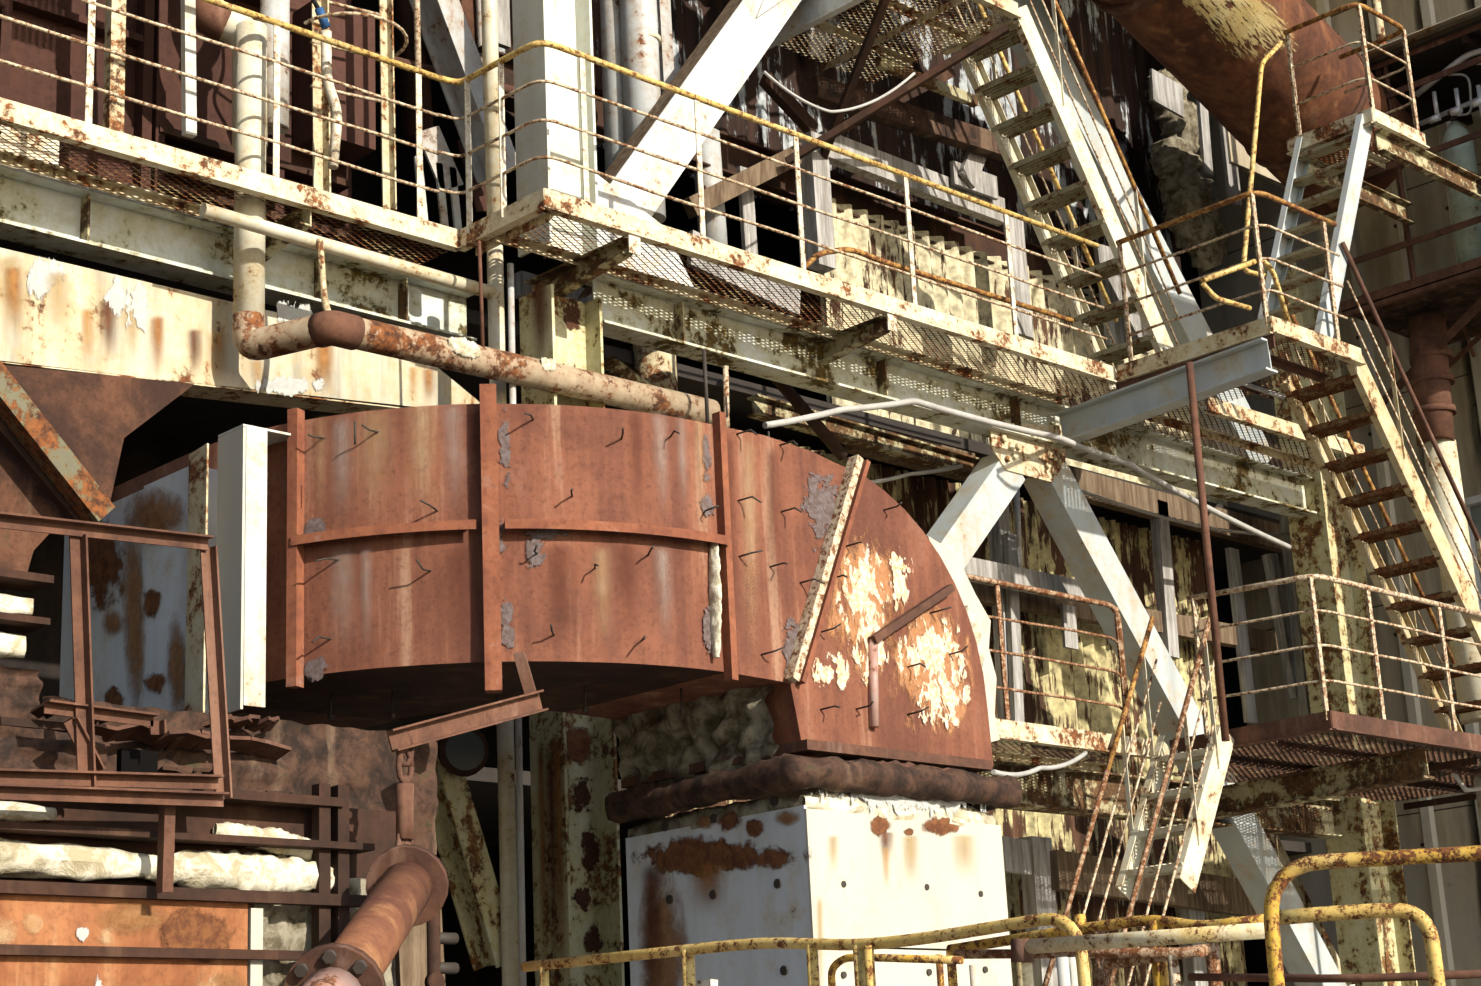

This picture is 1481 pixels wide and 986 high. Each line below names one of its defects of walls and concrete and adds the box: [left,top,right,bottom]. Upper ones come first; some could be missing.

peeling [1183,0,1298,64]
peeling [27,256,74,299]
rust [86,301,134,337]
peeling [104,275,149,333]
water stain [1460,340,1481,458]
rust [526,529,569,569]
rust [88,491,213,774]
peeling [812,539,974,734]
rust [228,714,291,761]
rust [871,815,966,867]
rust [633,811,810,986]
rust [106,904,239,986]